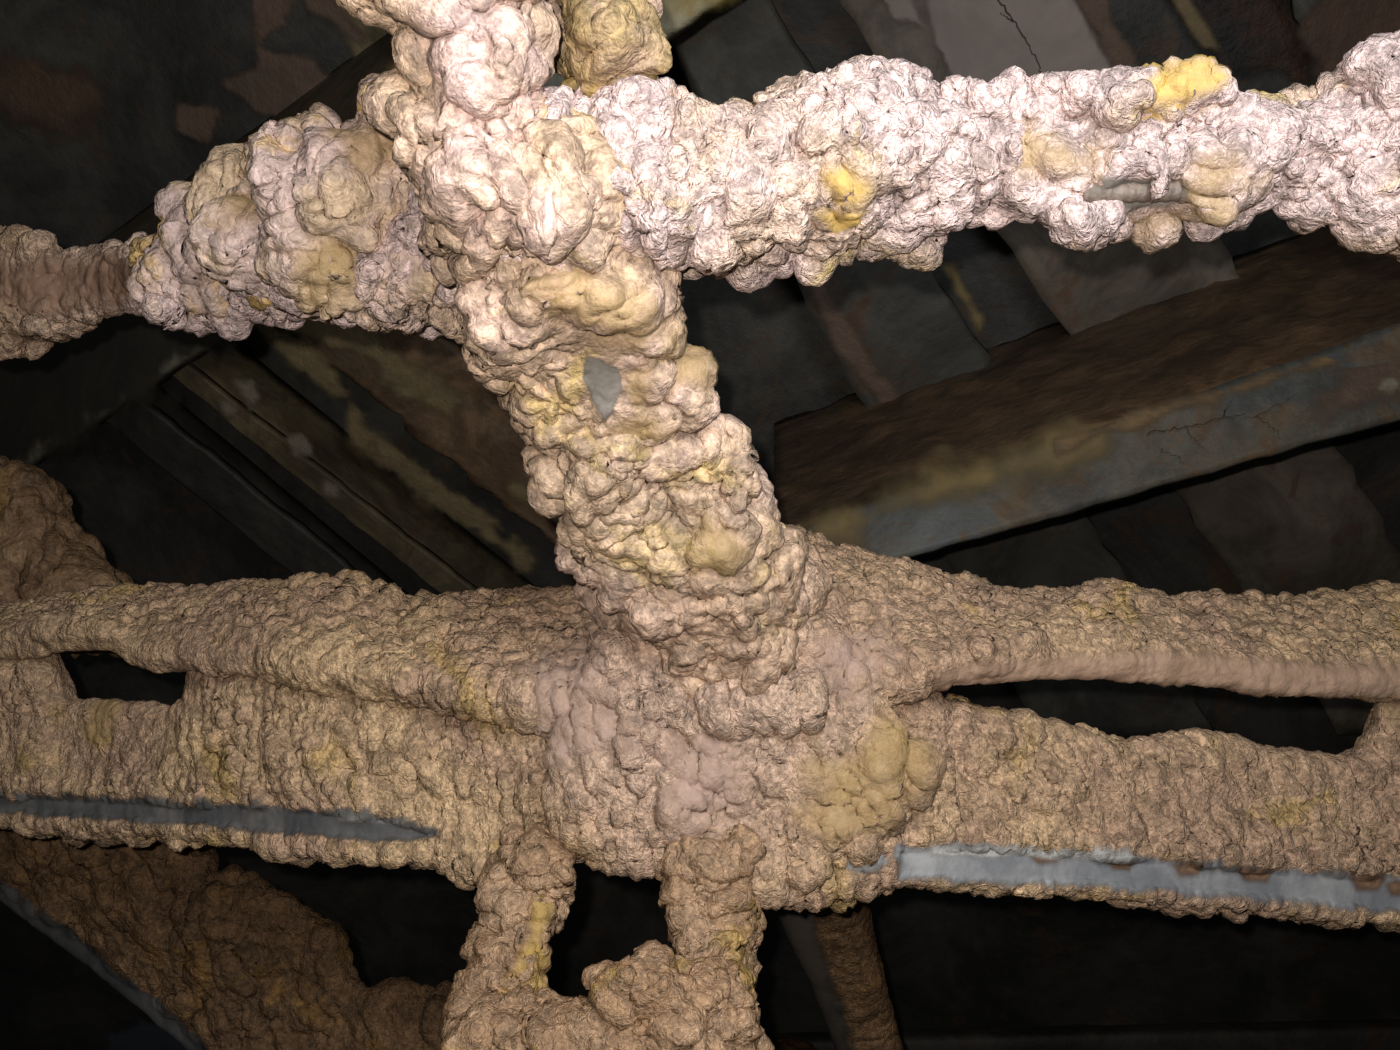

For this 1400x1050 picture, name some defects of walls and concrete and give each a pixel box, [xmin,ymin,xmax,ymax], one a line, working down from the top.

peeling [931,845,1139,862]